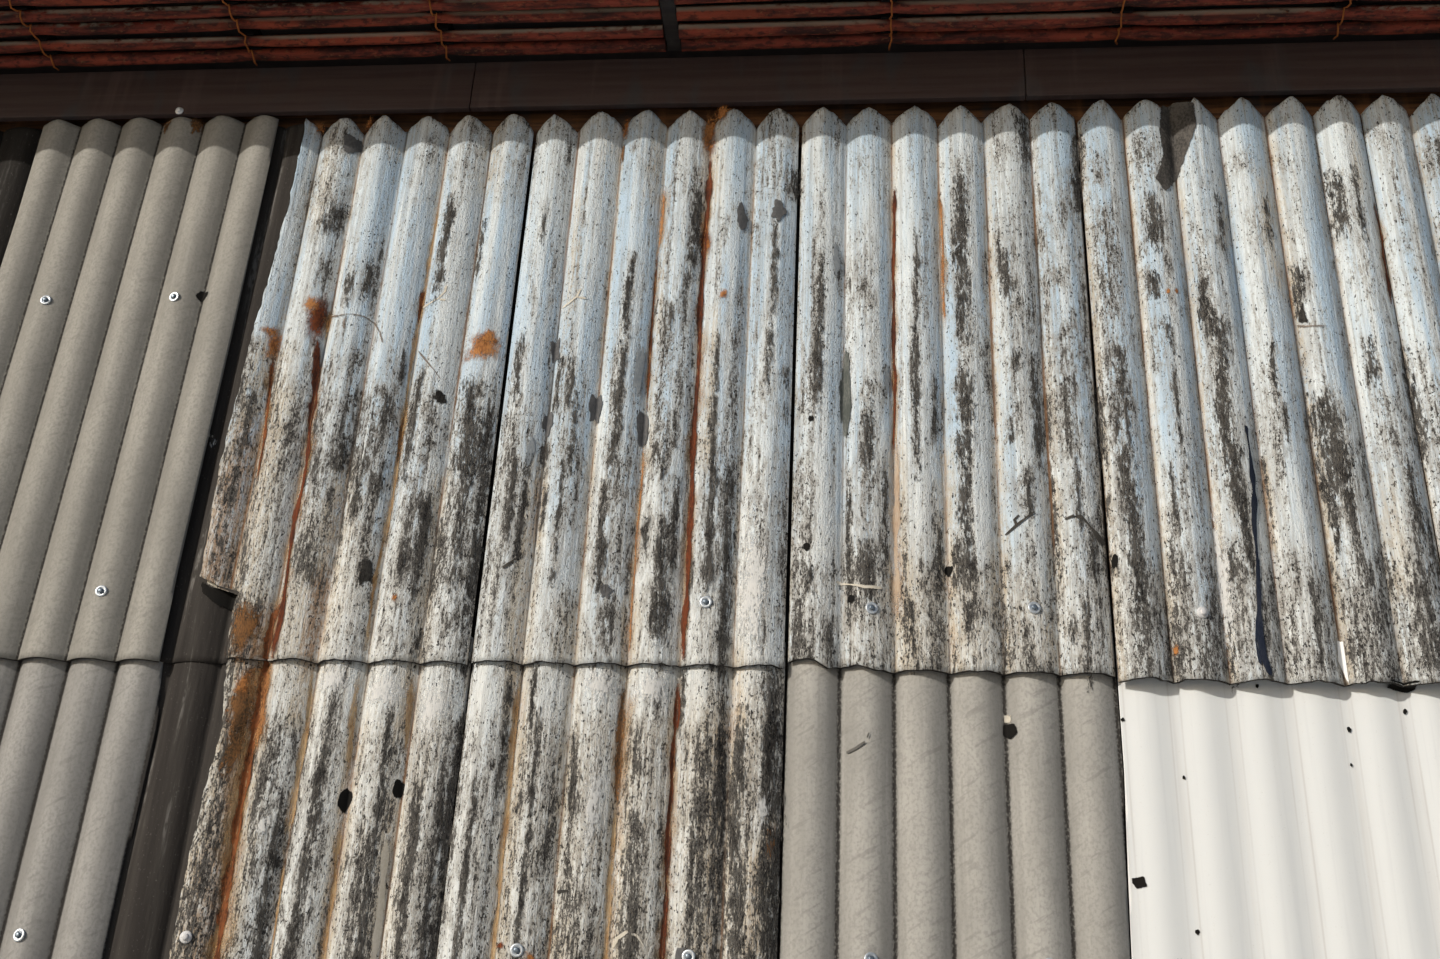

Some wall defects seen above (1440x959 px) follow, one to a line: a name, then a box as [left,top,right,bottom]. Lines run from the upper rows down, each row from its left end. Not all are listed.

spalling [201,581,238,610]
rust [207,297,331,959]
rust [465,330,501,360]
water stain [399,332,583,658]
water stain [593,251,637,593]
rust [680,105,728,659]
water stain [909,228,978,642]
water stain [1197,276,1255,688]
crack [1245,425,1272,675]
water stain [1266,337,1362,560]
water stain [395,667,541,959]
rust [659,683,681,959]